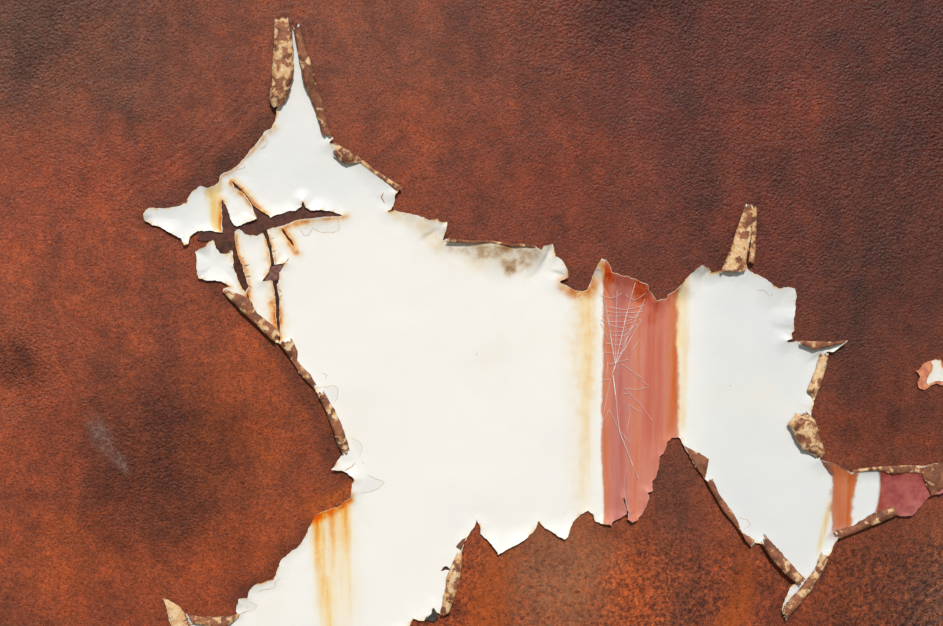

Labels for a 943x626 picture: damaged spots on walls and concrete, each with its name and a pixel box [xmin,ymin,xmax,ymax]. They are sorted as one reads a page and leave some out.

peeling [143,17,609,626]
rust [602,260,679,526]
peeling [610,204,943,621]
rust [832,465,858,531]
rust [876,467,943,516]